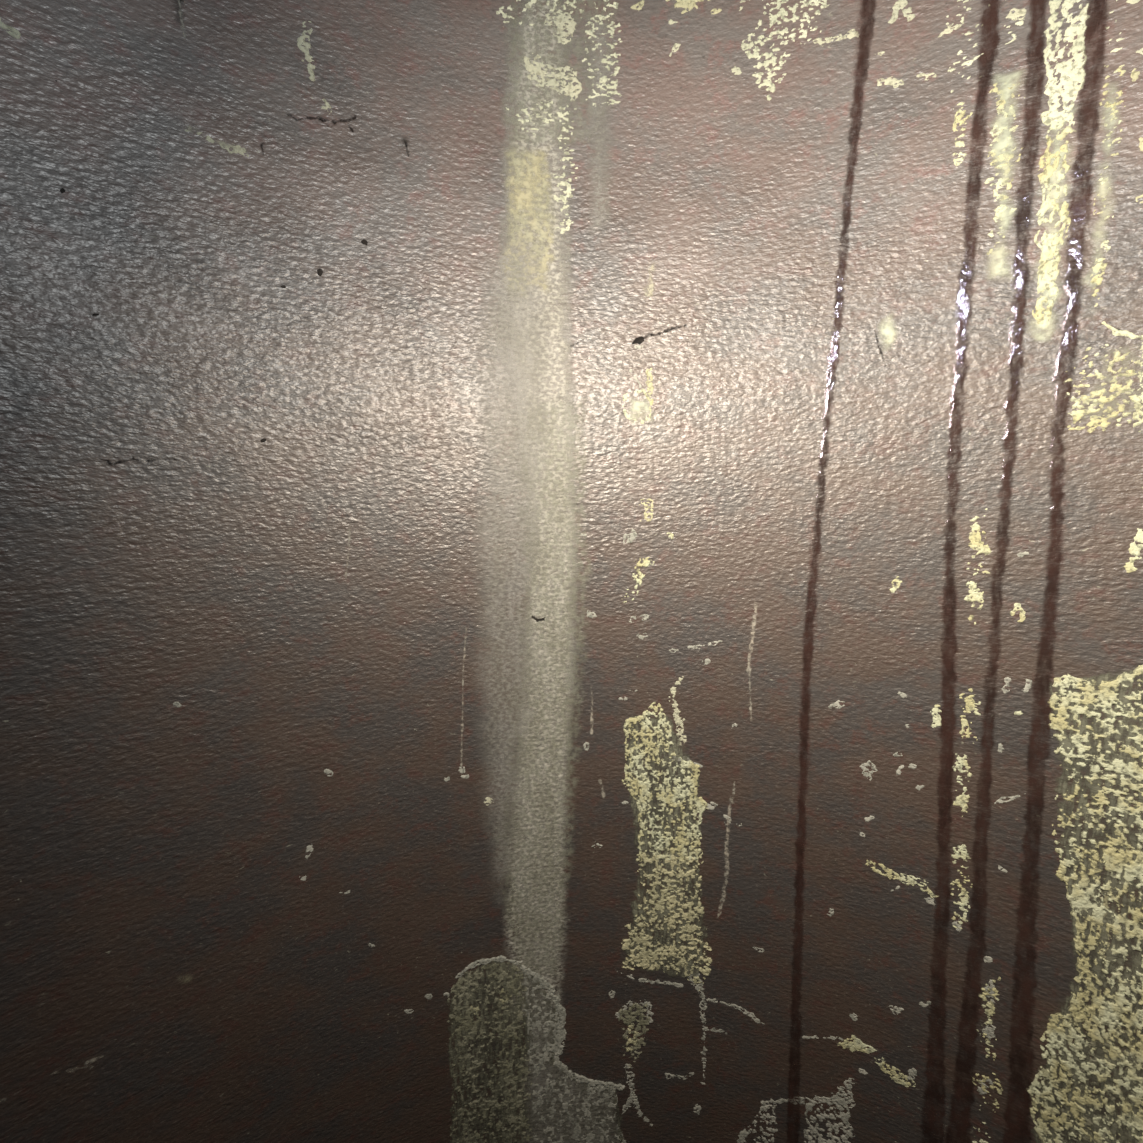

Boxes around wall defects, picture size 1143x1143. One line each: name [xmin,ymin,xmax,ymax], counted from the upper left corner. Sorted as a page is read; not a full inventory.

water stain [665,0,722,25]
peeling [1065,321,1143,433]
water stain [483,0,644,1021]
water stain [731,0,1126,1143]
peeling [1123,528,1143,573]
peeling [615,676,742,1085]
peeling [1027,665,1143,1143]
peeling [425,955,654,1143]
peeling [737,1068,868,1143]